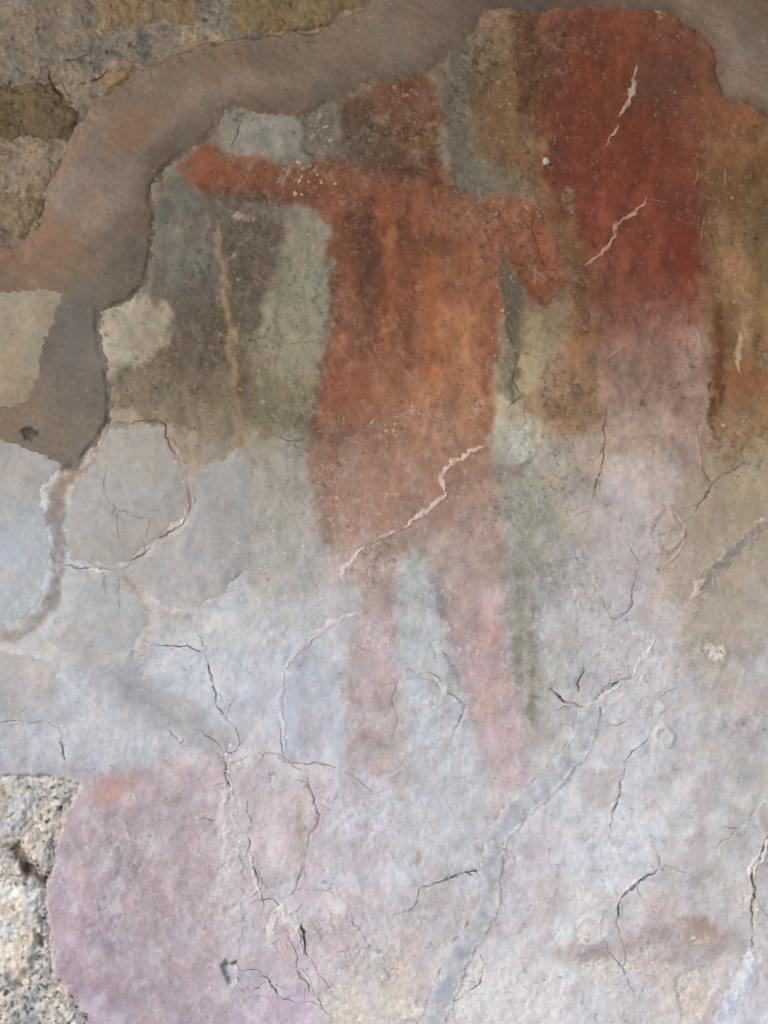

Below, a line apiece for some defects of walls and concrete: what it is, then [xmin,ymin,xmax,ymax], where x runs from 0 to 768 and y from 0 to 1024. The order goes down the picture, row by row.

peeling [272,113,340,196]
peeling [226,208,261,223]